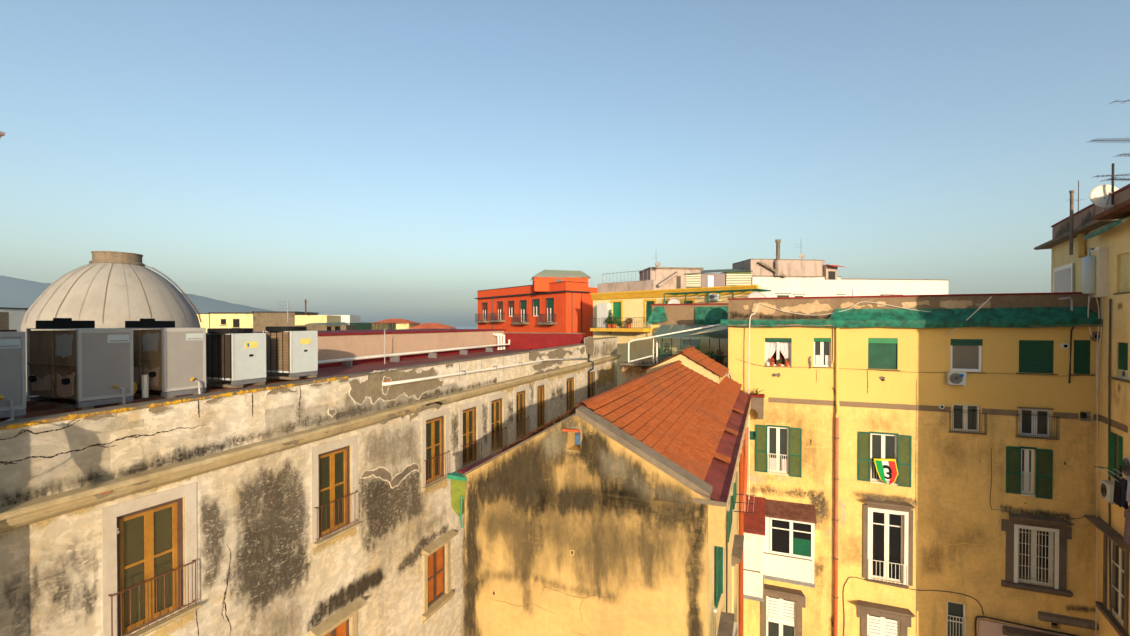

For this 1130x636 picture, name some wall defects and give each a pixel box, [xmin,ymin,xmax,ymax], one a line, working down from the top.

peeling [743,299,887,315]
peeling [901,299,992,309]
crack [0,400,206,465]
mould [202,501,225,586]
mould [232,465,309,619]
peeling [360,463,419,488]
leakage [360,471,422,550]
leakage [399,526,447,571]
leakage [463,418,716,636]
leakage [747,474,827,525]
leakage [5,554,81,607]
leakage [308,569,383,631]